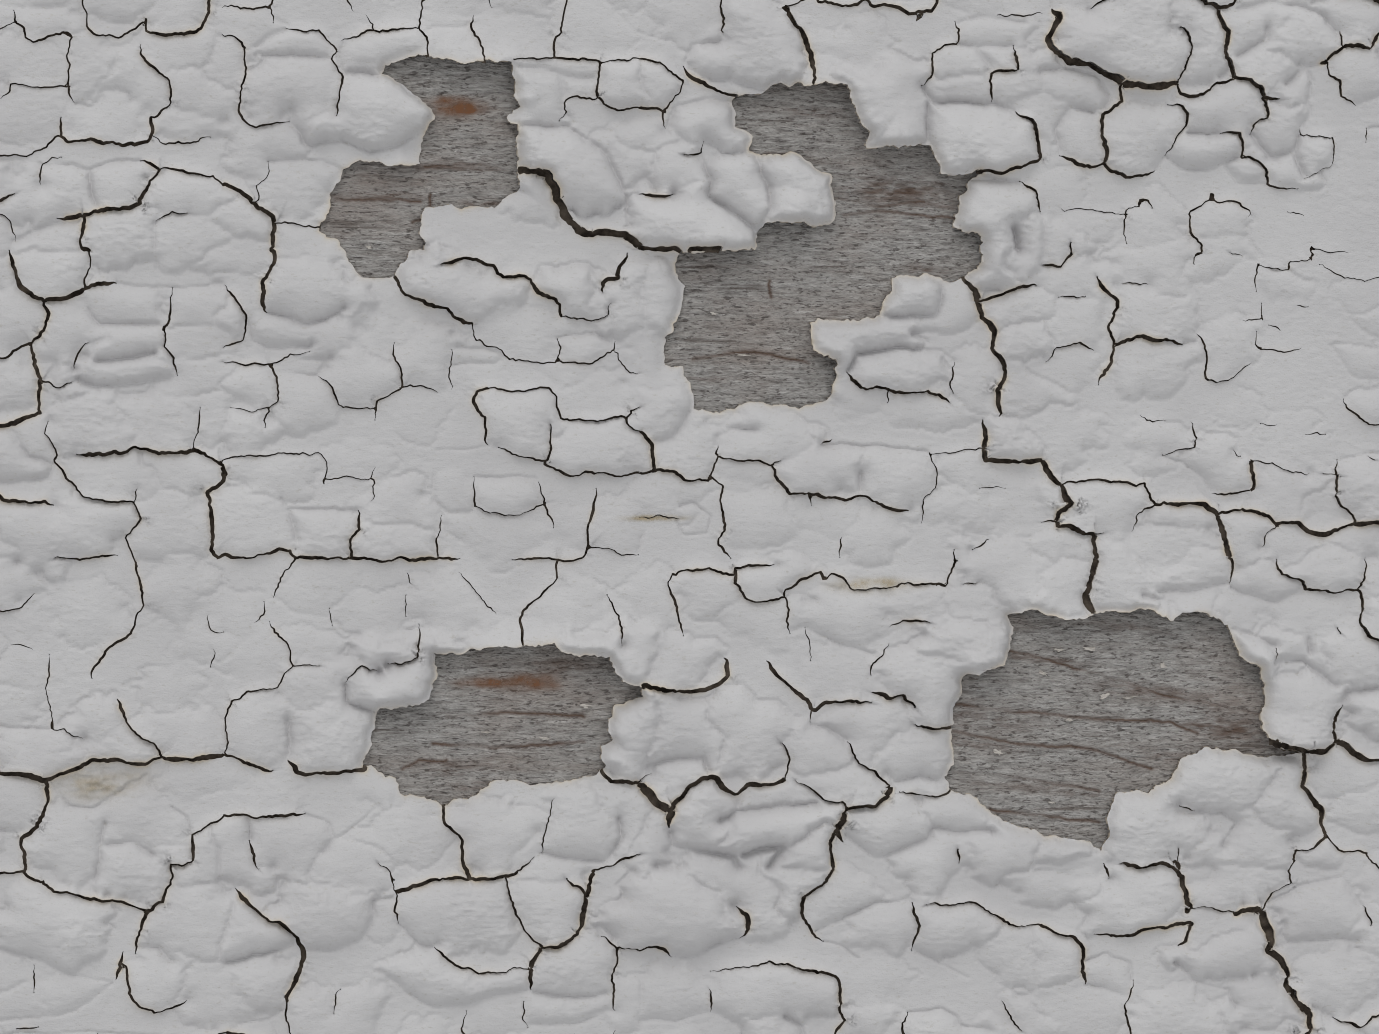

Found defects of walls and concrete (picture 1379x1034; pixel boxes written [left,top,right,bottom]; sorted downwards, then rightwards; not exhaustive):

peeling [302,0,1039,413]
crack [782,0,960,86]
crack [976,0,1334,243]
crack [1320,0,1379,138]
peeling [344,628,660,805]
crack [641,658,730,694]
crack [766,619,951,730]
peeling [871,601,1379,851]
crack [379,800,670,1034]
crack [598,741,950,1034]
crack [912,708,1379,1034]